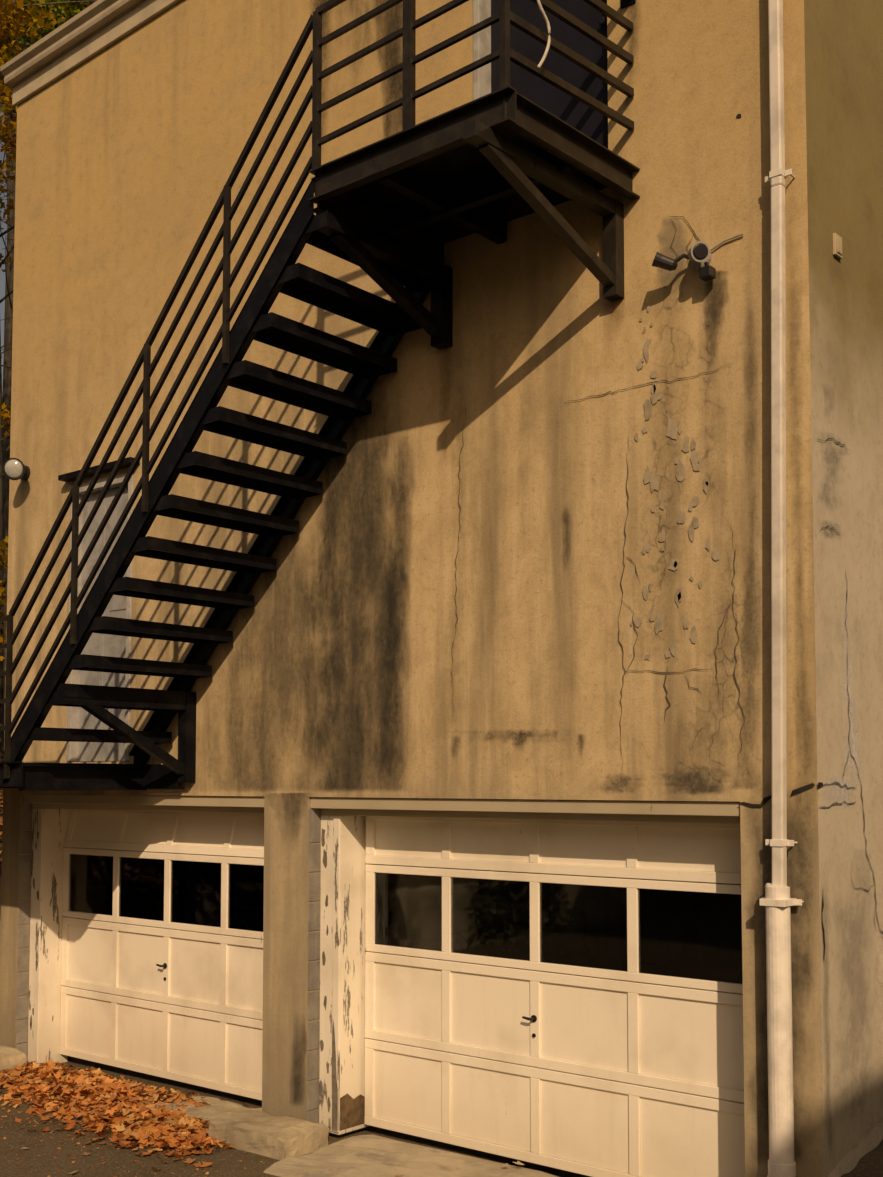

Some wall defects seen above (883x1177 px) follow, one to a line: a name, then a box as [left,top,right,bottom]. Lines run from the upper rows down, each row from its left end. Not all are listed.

damp [385,0,403,137]
damp [709,271,724,323]
crack [567,364,728,402]
peeling [635,303,663,441]
peeling [666,416,720,560]
damp [316,393,403,789]
crack [618,436,745,765]
peeling [675,575,703,643]
damp [677,773,718,793]
crack [821,577,883,938]
crack [819,900,827,957]
peeling [319,995,365,1131]